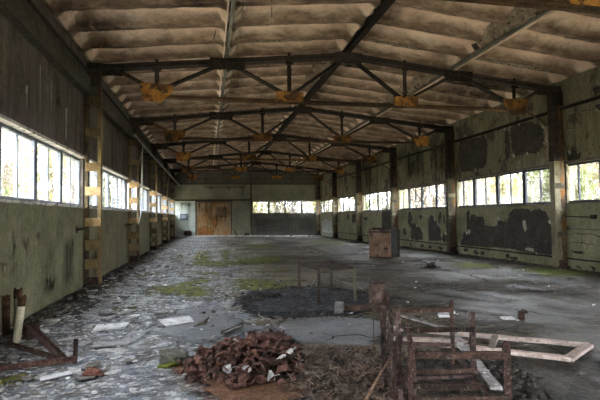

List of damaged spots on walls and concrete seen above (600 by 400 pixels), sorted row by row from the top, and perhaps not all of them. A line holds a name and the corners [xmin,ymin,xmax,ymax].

peeling [503,120,549,163]
rust [198,204,227,235]
peeling [403,211,447,243]
peeling [459,208,552,261]